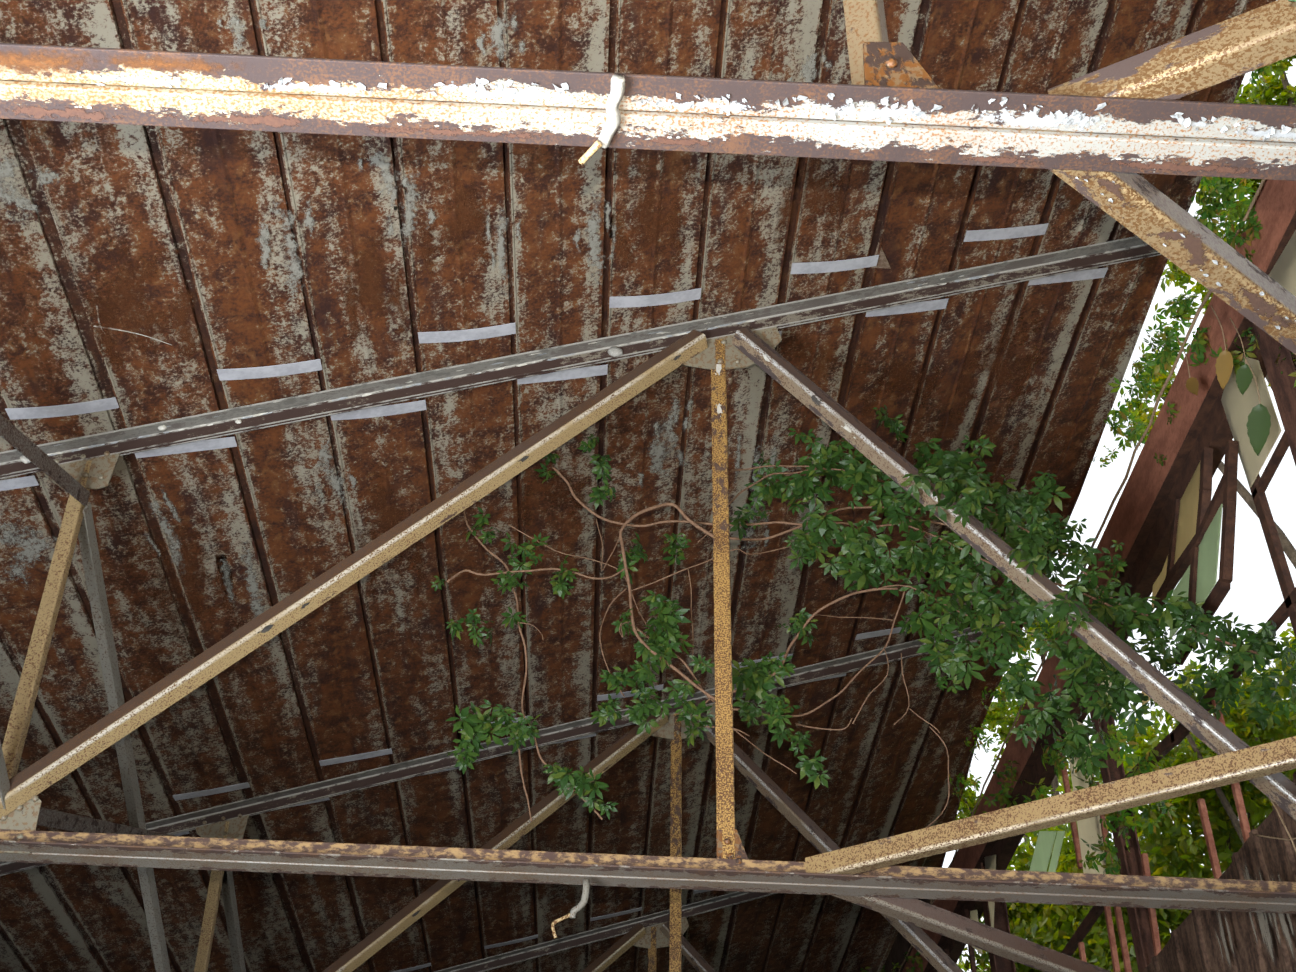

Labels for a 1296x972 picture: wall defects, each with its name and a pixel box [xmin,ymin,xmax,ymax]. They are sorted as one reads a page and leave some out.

rust [0,53,82,74]
rust [112,56,222,72]
peeling [429,78,578,104]
peeling [636,53,943,125]
rust [2,106,120,122]
rust [147,107,301,128]
rust [650,136,726,146]
peeling [971,97,1114,131]
peeling [1170,112,1296,142]
rust [1075,158,1281,208]
rust [1147,227,1227,286]
rust [1238,285,1296,330]